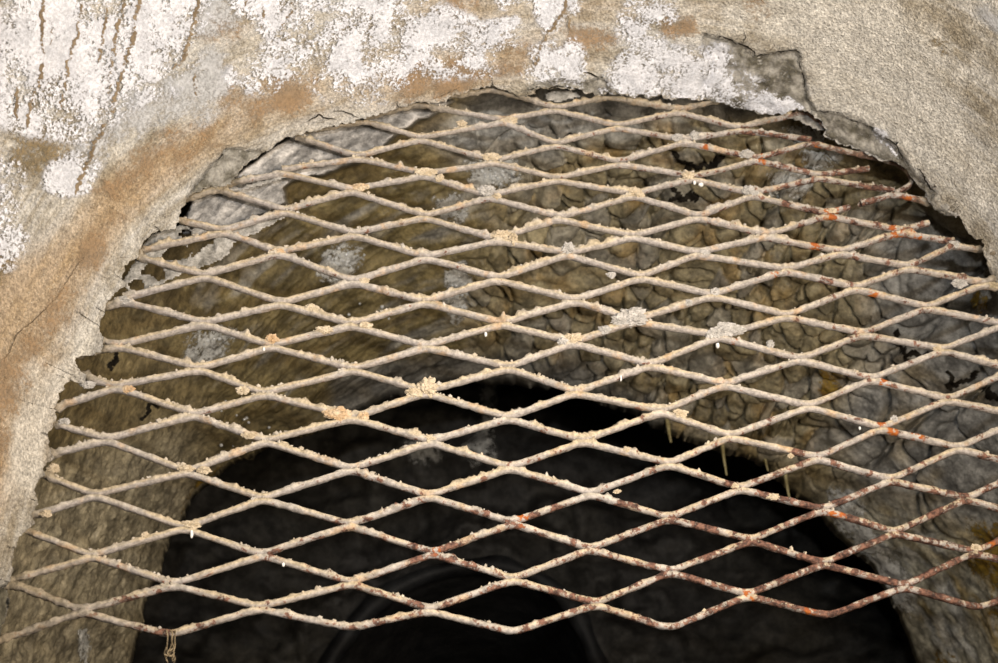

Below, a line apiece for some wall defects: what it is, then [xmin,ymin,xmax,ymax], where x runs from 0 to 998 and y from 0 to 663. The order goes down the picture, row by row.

water stain [0,0,589,285]
spalling [525,77,612,102]
water stain [627,186,645,198]
water stain [671,130,700,142]
water stain [598,0,804,115]
water stain [739,149,755,159]
water stain [742,124,843,201]
spalling [701,33,960,218]
peeling [123,217,285,291]
water stain [442,261,473,325]
corrosion [971,291,988,314]
corrosion [966,518,998,620]